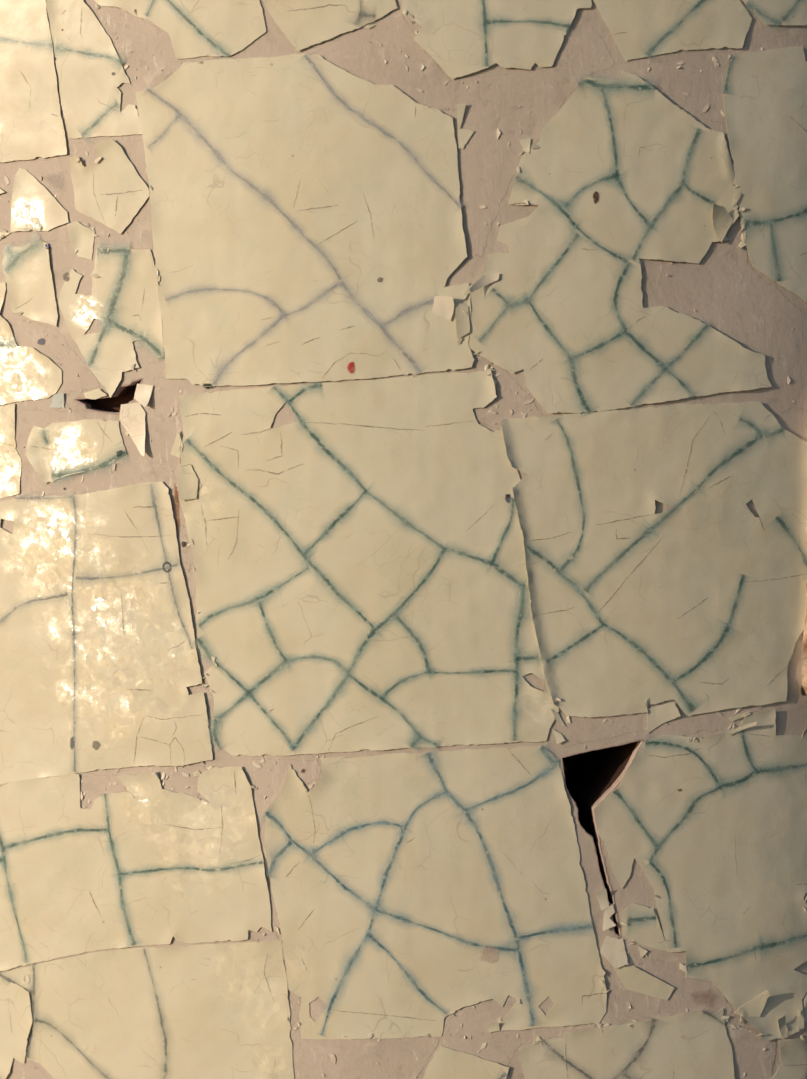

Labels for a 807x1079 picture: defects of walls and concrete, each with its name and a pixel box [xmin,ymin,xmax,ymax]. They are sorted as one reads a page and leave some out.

peeling [94,2,182,97]
crack [146,0,229,56]
crack [482,0,570,66]
peeling [0,139,153,249]
crack [89,247,163,366]
crack [166,185,434,385]
crack [479,79,714,413]
peeling [16,312,213,572]
peeling [474,358,545,429]
crack [0,363,807,1079]
peeling [552,698,763,747]
peeling [296,889,807,1079]